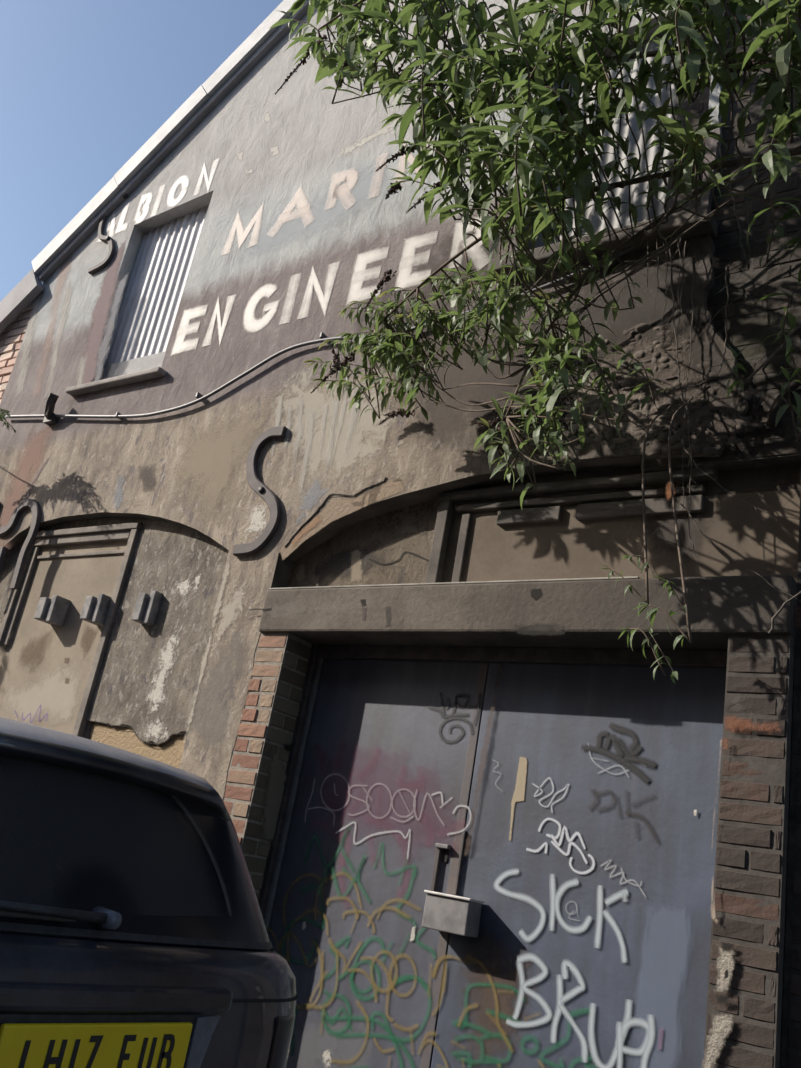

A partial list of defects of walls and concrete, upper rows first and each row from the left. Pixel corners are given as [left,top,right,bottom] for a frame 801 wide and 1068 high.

peeling [245,505,267,539]
peeling [172,574,201,595]
peeling [213,582,245,648]
flaking render [90,626,188,768]
flaking render [703,942,734,1068]